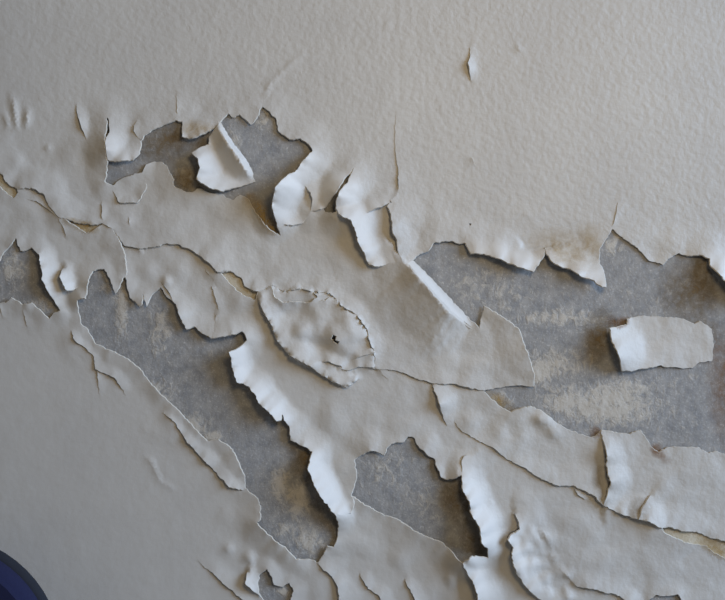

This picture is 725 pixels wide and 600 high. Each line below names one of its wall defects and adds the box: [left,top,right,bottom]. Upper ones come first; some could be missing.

peeling [0,232,587,600]
peeling [99,90,725,459]
peeling [644,588,686,600]